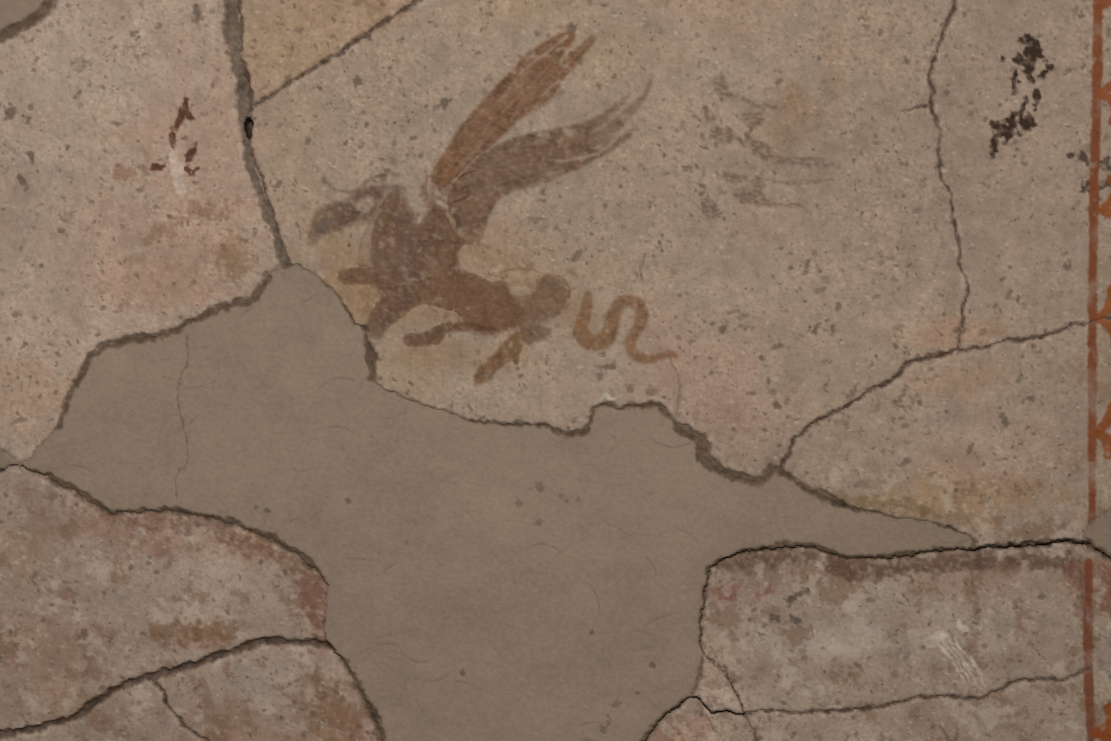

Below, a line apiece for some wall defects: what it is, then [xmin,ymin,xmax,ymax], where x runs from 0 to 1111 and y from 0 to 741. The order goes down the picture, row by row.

crack [222,0,424,270]
leakage [986,30,1058,160]
crack [780,0,1086,472]
crack [173,334,191,501]
peeling [593,391,617,407]
crack [665,346,685,420]
crack [969,539,1108,561]
crack [0,637,337,741]
crack [691,654,1084,741]